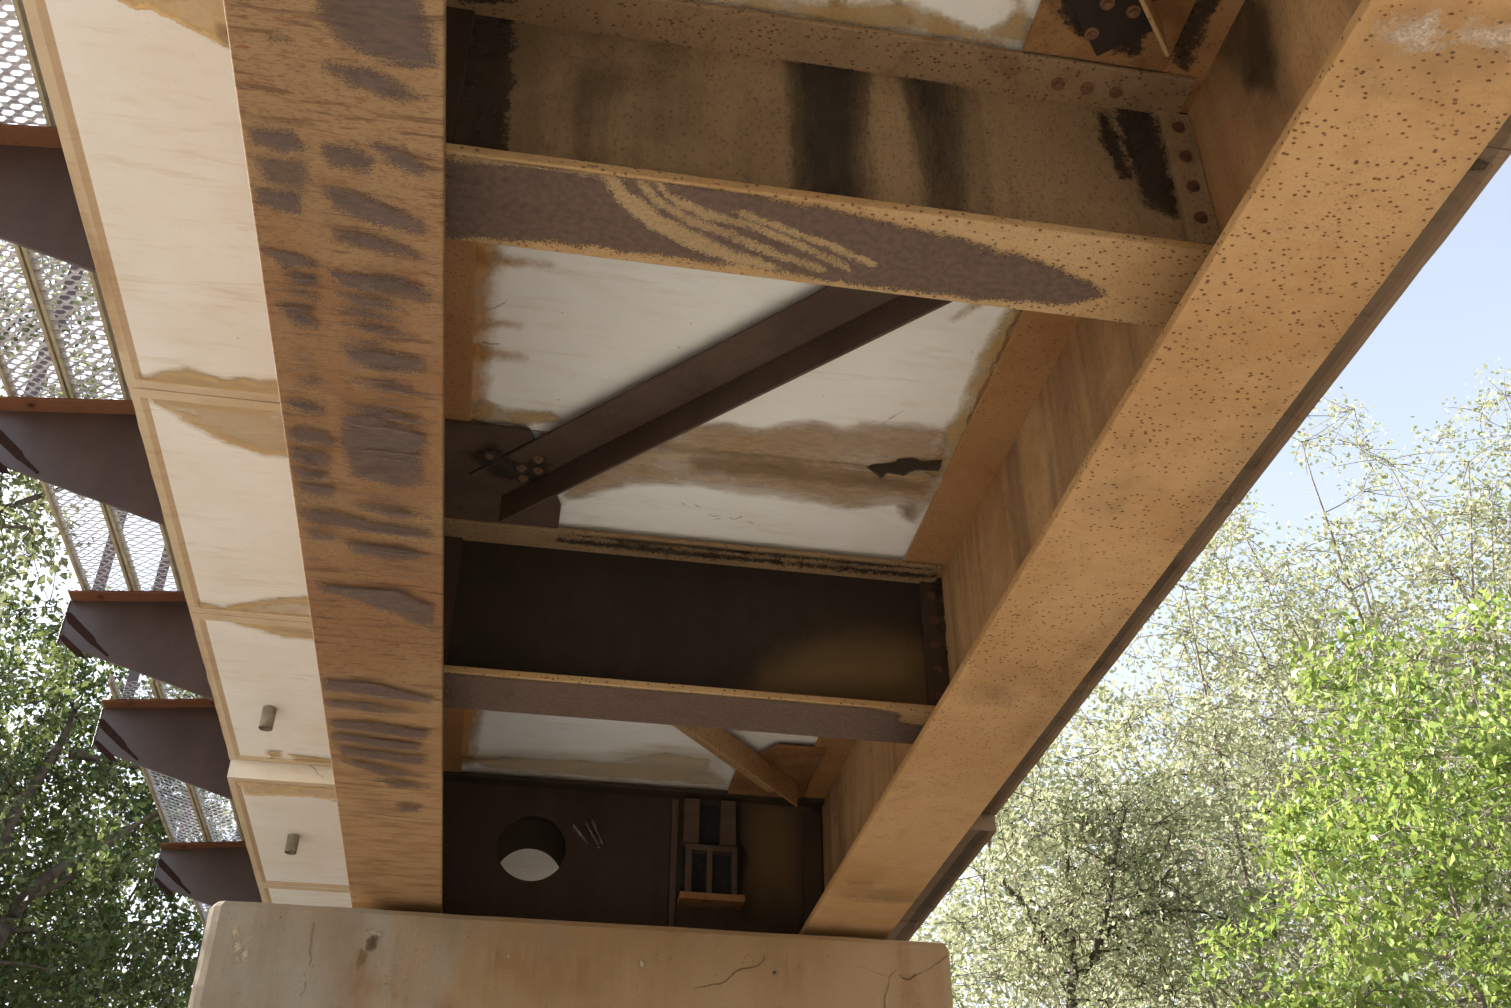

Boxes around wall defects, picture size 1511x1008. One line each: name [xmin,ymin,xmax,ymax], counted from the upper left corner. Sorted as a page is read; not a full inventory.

damp [118,0,230,48]
damp [1112,35,1146,59]
rust [446,154,878,275]
damp [138,0,1106,656]
damp [236,674,924,823]
crack [884,957,945,1008]